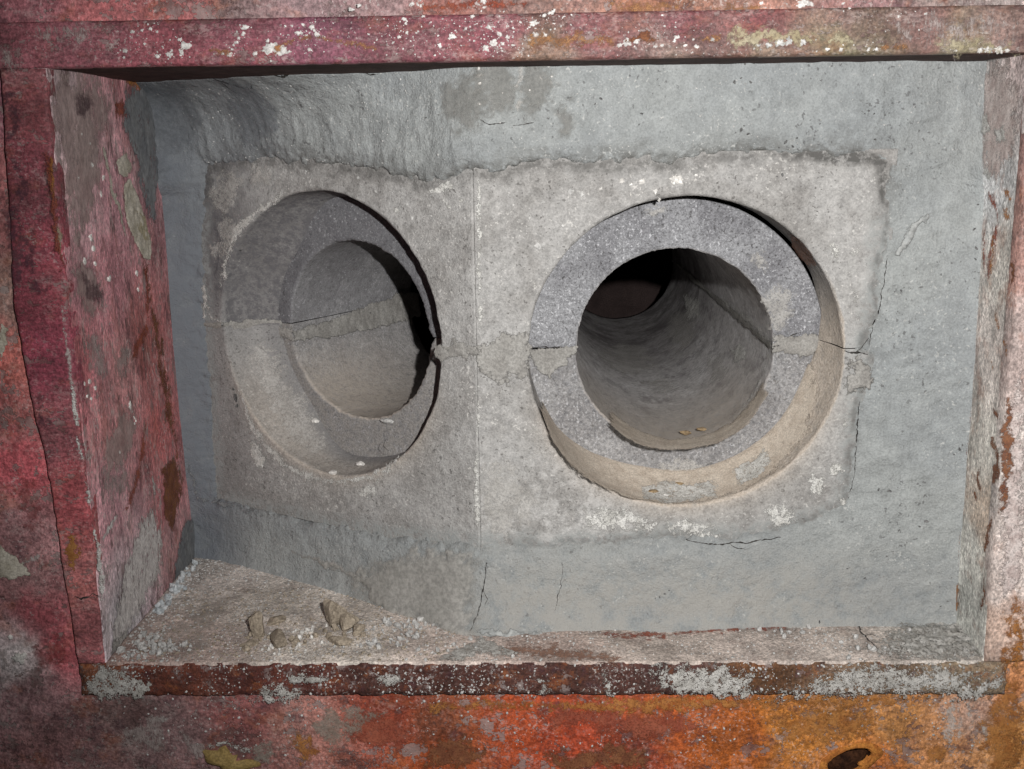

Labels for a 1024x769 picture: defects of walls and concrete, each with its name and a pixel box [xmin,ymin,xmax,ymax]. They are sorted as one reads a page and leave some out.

corrosion [422,0,526,14]
corrosion [528,30,659,48]
corrosion [702,25,813,50]
corrosion [983,190,1011,281]
crack [844,258,888,355]
crack [686,537,780,549]
crack [469,562,488,631]
corrosion [332,710,487,769]
corrosion [429,693,942,769]
corrosion [923,746,946,763]